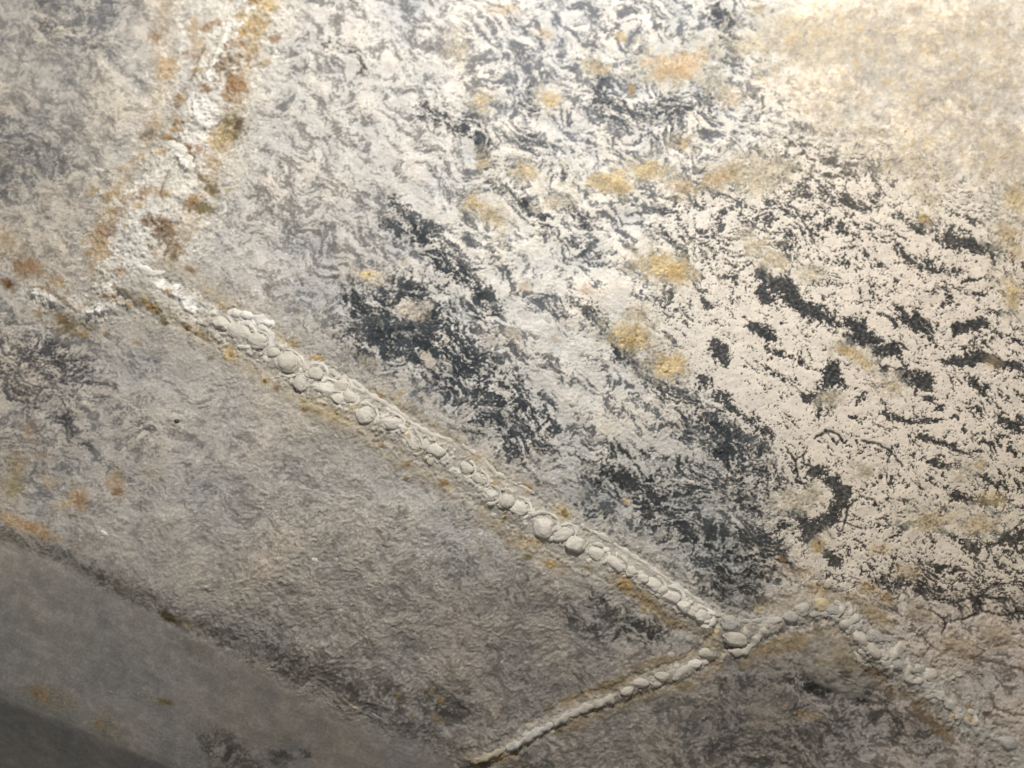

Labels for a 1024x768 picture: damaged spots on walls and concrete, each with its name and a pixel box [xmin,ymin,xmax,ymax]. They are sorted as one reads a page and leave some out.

leakage [415,101,600,265]
leakage [337,194,561,465]
crack [450,412,475,431]
leakage [560,286,798,602]
crack [786,429,903,490]
crack [838,496,881,536]
leakage [589,598,669,639]
leakage [874,565,1024,622]
crack [916,582,1023,634]
leakage [786,671,865,703]
crack [958,650,1024,672]